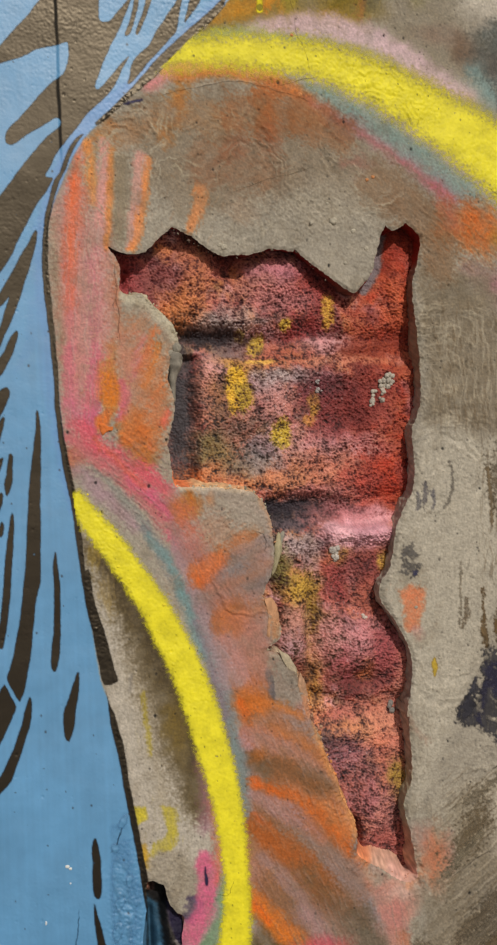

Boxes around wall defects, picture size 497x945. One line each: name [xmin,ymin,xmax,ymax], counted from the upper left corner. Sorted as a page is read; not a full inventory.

spalling [108,223,454,883]
spalling [143,881,185,945]